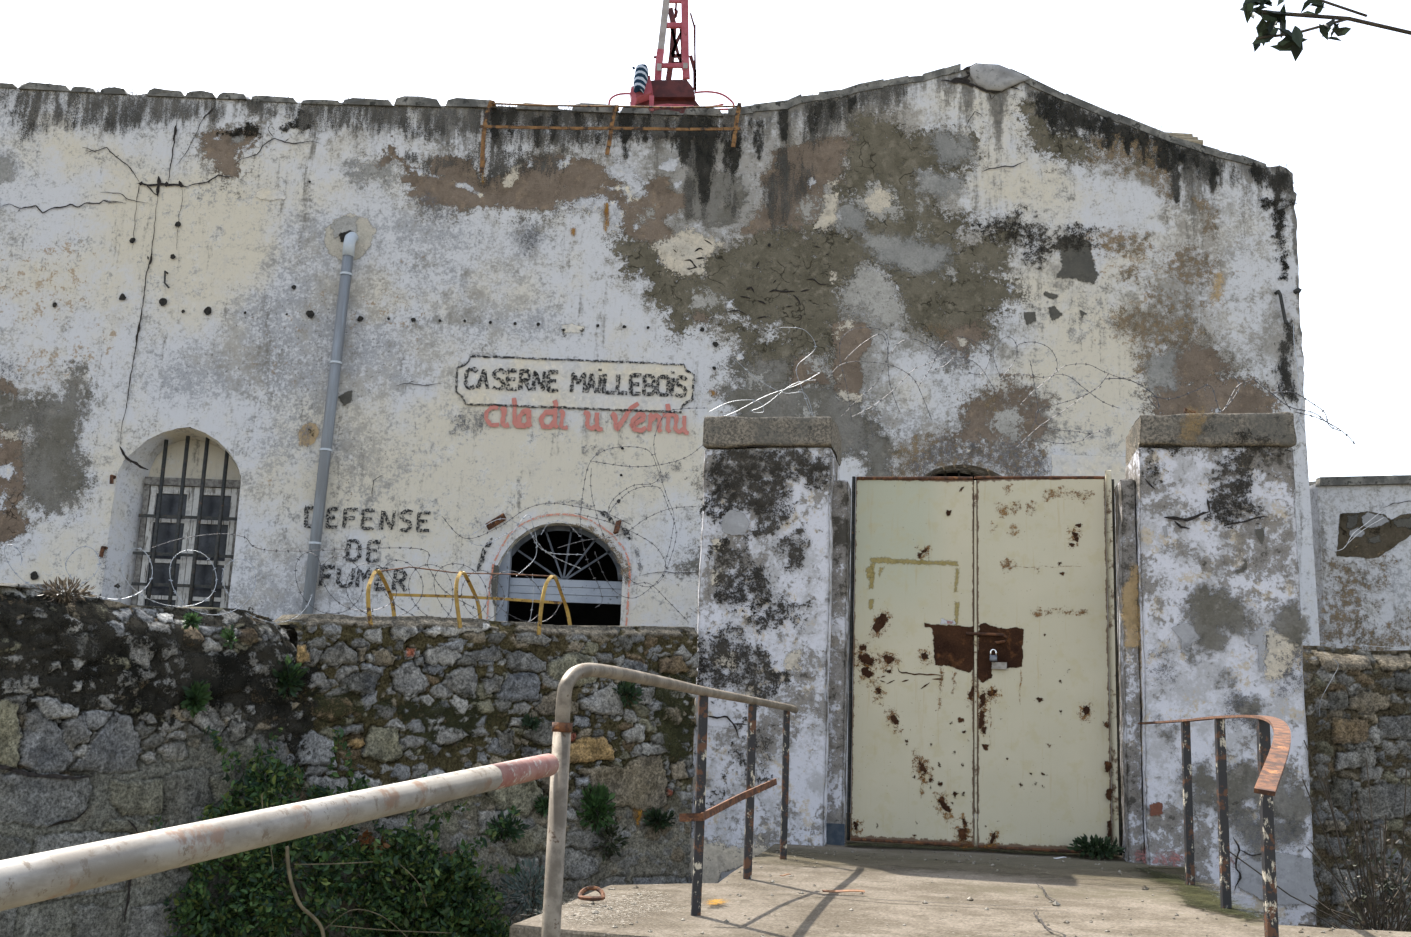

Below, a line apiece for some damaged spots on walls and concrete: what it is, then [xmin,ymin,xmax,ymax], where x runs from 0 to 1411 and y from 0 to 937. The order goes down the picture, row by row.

crack [3,104,318,470]
flaking render [182,115,274,198]
damp [0,75,908,231]
flaking render [359,94,1104,477]
damp [970,205,1104,274]
damp [1029,92,1297,282]
damp [1271,319,1299,405]
spalling [0,422,48,556]
spalling [1336,511,1411,559]
corrosion [850,609,1000,852]
corrosion [917,649,1022,751]
corrosion [1060,702,1109,728]